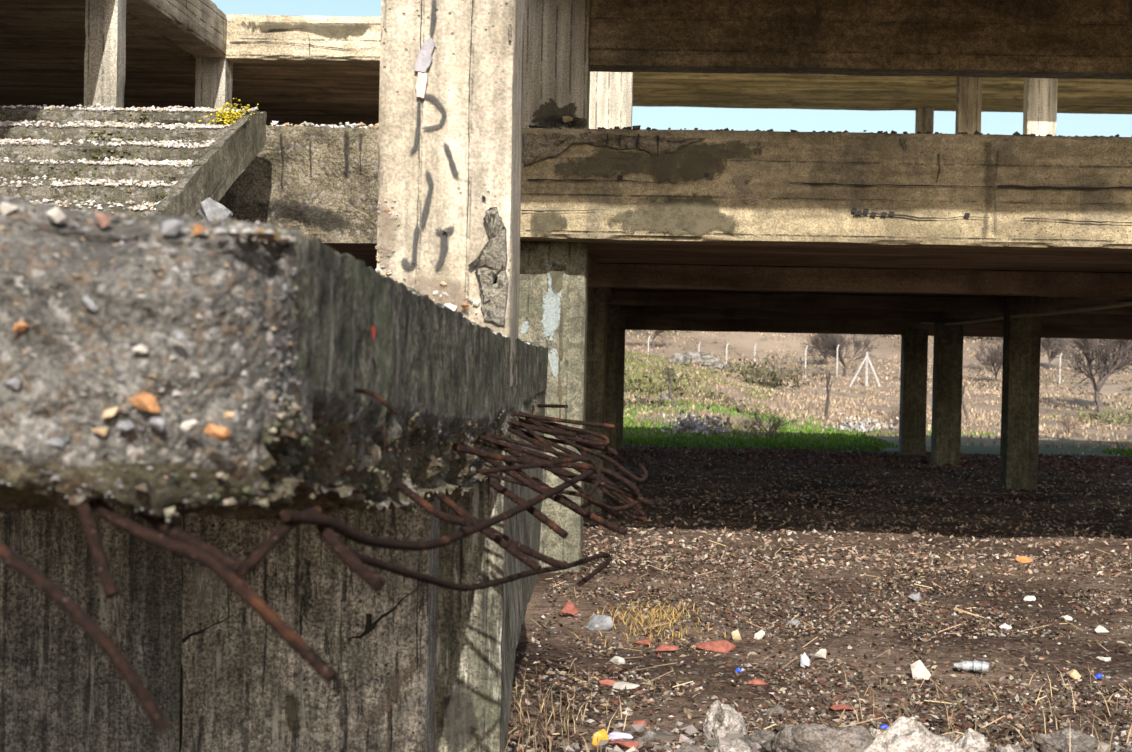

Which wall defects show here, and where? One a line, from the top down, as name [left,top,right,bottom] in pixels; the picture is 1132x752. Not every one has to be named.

leakage [531,99,587,128]
spalling [375,199,400,275]
spalling [410,195,531,326]
leakage [530,210,567,235]
leakage [555,140,762,236]
spalling [280,260,654,592]
crack [348,582,424,639]